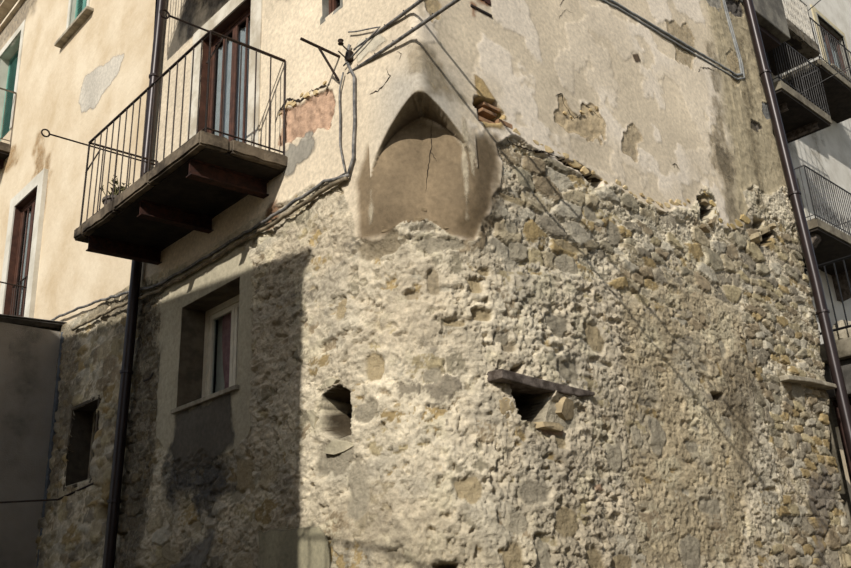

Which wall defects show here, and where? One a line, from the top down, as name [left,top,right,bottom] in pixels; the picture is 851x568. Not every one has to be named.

damp [179,0,227,39]
spalling [79,54,124,112]
spalling [278,81,335,176]
crack [426,126,436,189]
crack [507,138,601,183]
spalling [554,95,606,145]
spalling [622,124,642,162]